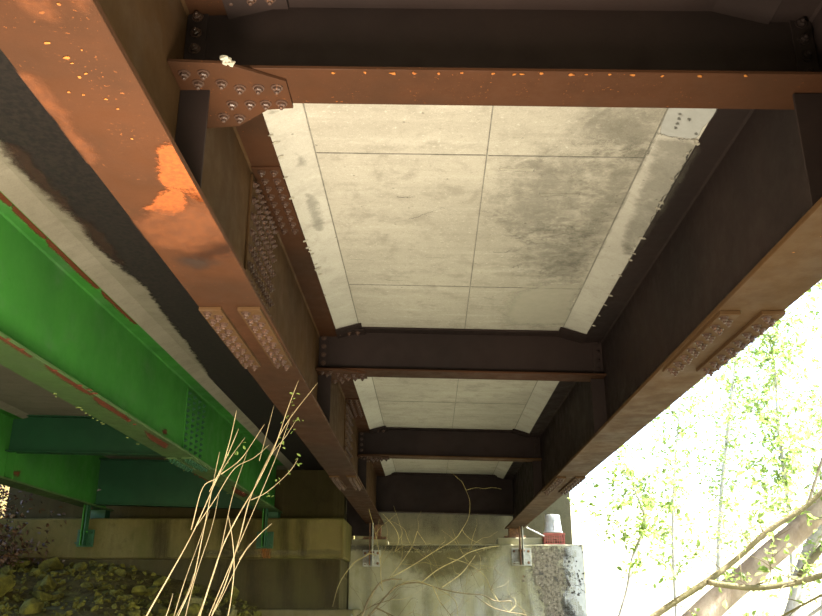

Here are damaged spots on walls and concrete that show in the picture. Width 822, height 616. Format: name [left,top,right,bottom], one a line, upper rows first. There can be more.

corrosion [143,143,204,216]
water stain [0,49,324,470]
water stain [563,545,587,616]